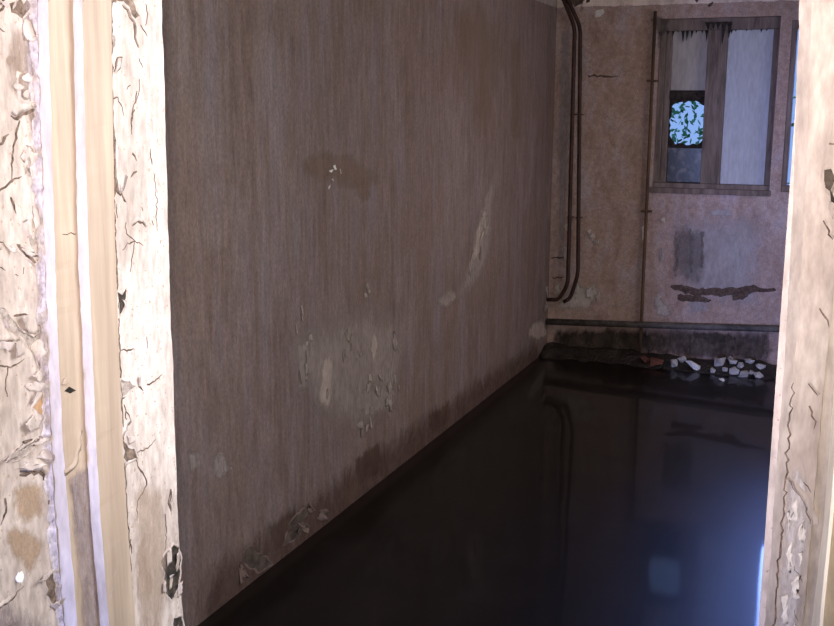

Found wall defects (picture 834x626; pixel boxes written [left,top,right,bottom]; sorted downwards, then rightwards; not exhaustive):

flaking render [0,0,36,42]
flaking render [111,0,141,23]
water stain [675,223,755,301]
flaking render [117,285,128,319]
peeling [0,306,55,471]
flaking render [122,435,139,466]
crack [772,379,824,626]
peeling [8,529,41,583]
peeling [38,569,62,610]
flaking render [160,542,183,603]
peeling [780,470,807,626]
flaking render [172,613,185,626]